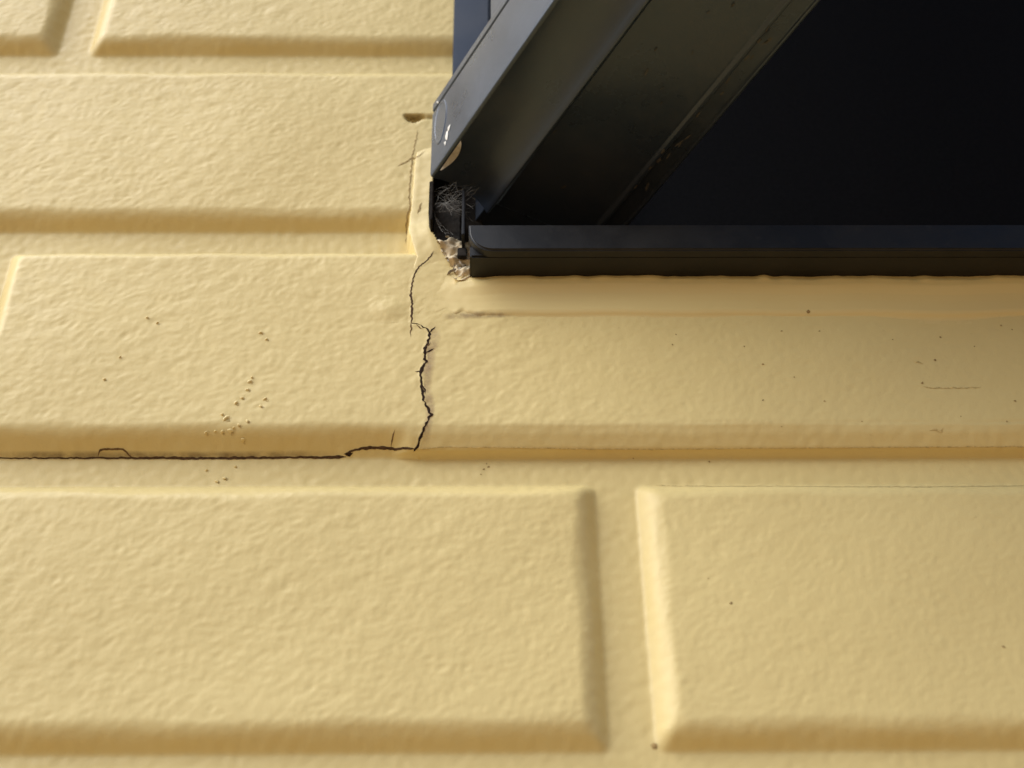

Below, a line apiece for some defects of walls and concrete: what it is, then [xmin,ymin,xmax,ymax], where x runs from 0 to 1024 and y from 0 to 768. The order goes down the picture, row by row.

crack [398,132,422,242]
crack [0,250,684,460]
crack [712,443,1024,451]